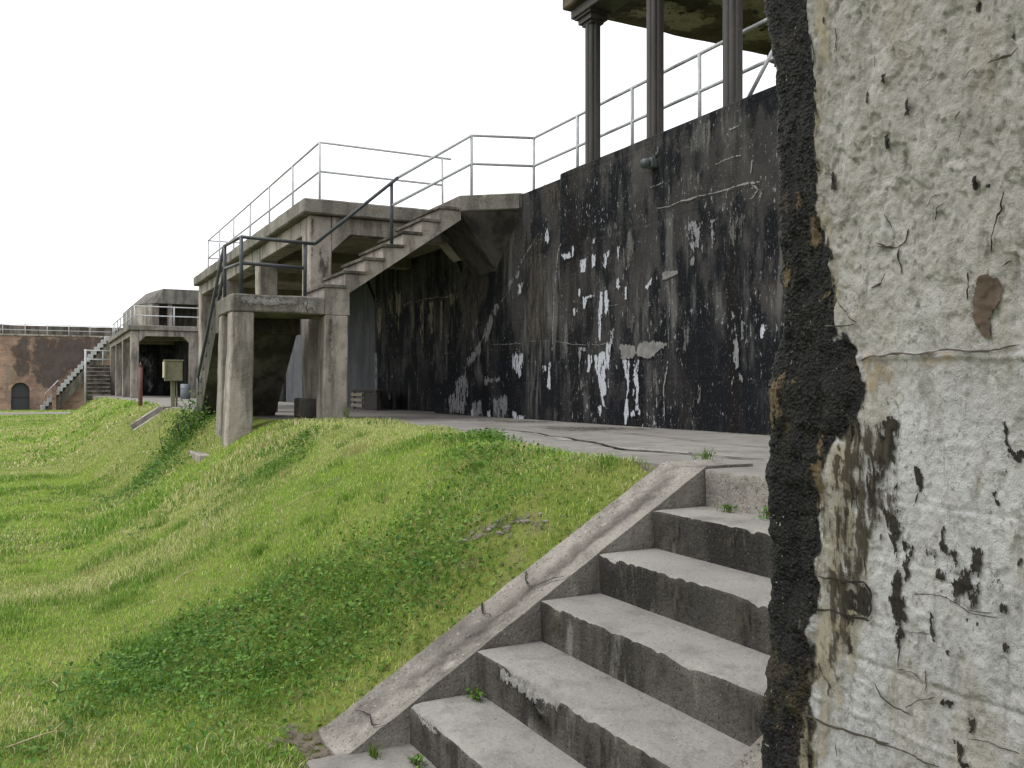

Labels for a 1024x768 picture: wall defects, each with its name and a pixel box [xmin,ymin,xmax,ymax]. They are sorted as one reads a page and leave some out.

leakage [5,336,101,403]
leakage [377,290,457,353]
peeling [561,237,620,272]
spalling [573,278,667,425]
crack [480,279,761,459]
spalling [645,270,678,289]
leakage [733,0,1000,768]
crack [871,214,909,288]
crack [825,299,1017,361]
peeling [972,274,1002,338]
crack [991,191,1011,267]
leakage [1002,421,1024,473]